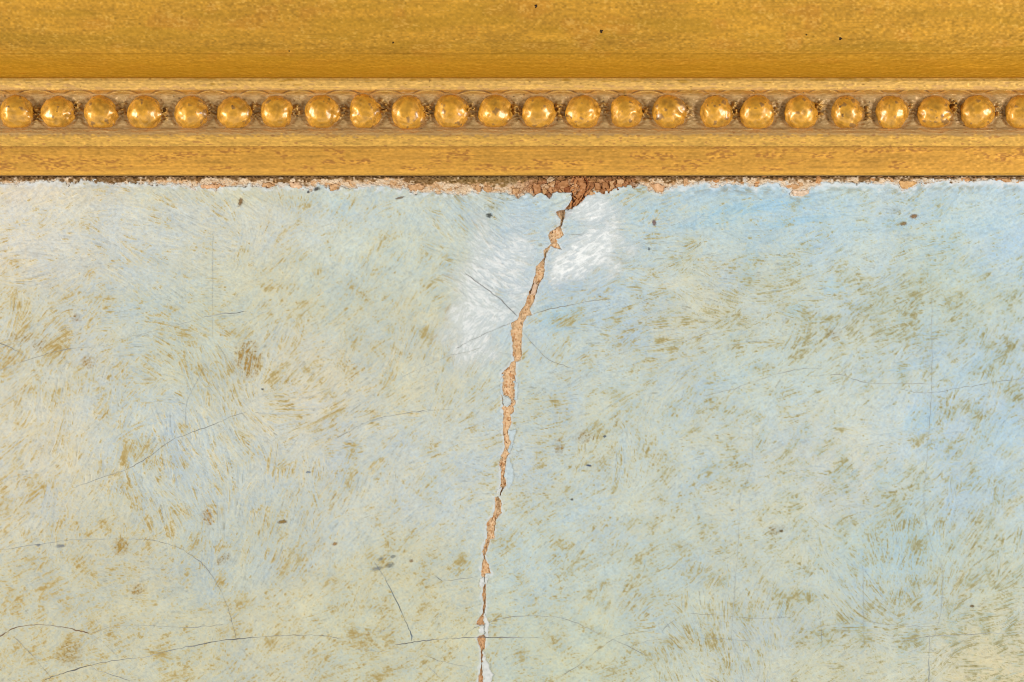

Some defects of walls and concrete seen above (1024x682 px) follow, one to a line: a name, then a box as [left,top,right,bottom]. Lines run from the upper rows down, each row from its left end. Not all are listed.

peeling [0,176,1024,206]
crack [0,176,1024,682]